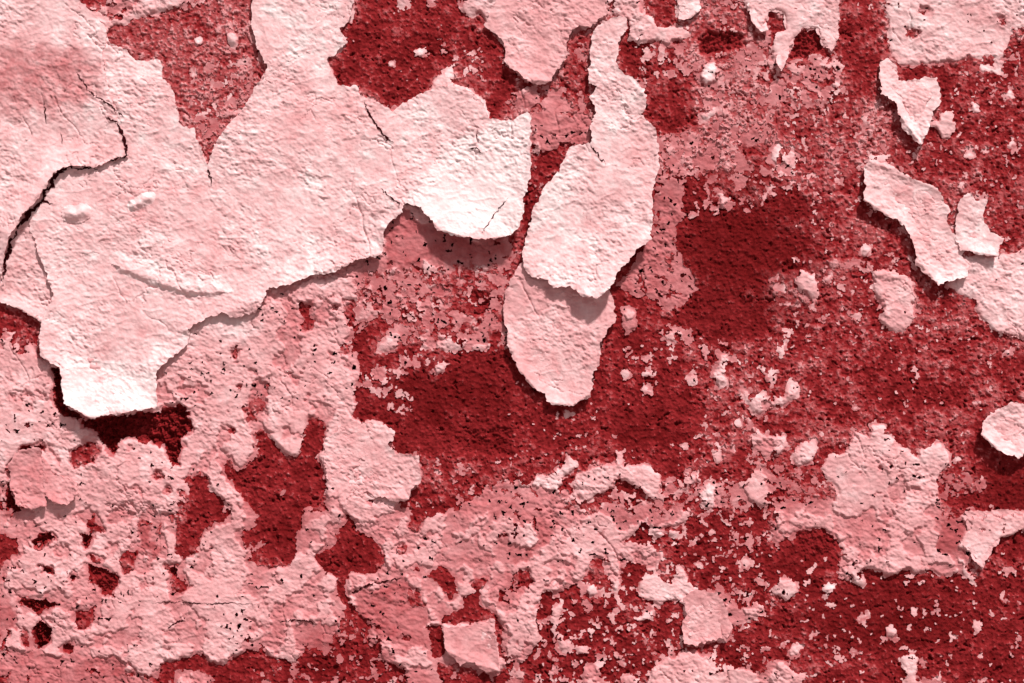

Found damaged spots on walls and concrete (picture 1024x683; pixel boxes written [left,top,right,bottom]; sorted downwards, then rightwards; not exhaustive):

crack [1,74,128,286]
peeling [0,0,617,469]
peeling [224,0,1024,683]
peeling [0,533,20,582]
peeling [0,596,61,654]
peeling [0,444,78,517]
peeling [31,531,55,551]
peeling [63,643,74,654]
peeling [70,513,139,630]
peeling [137,470,231,593]
peeling [125,514,409,683]